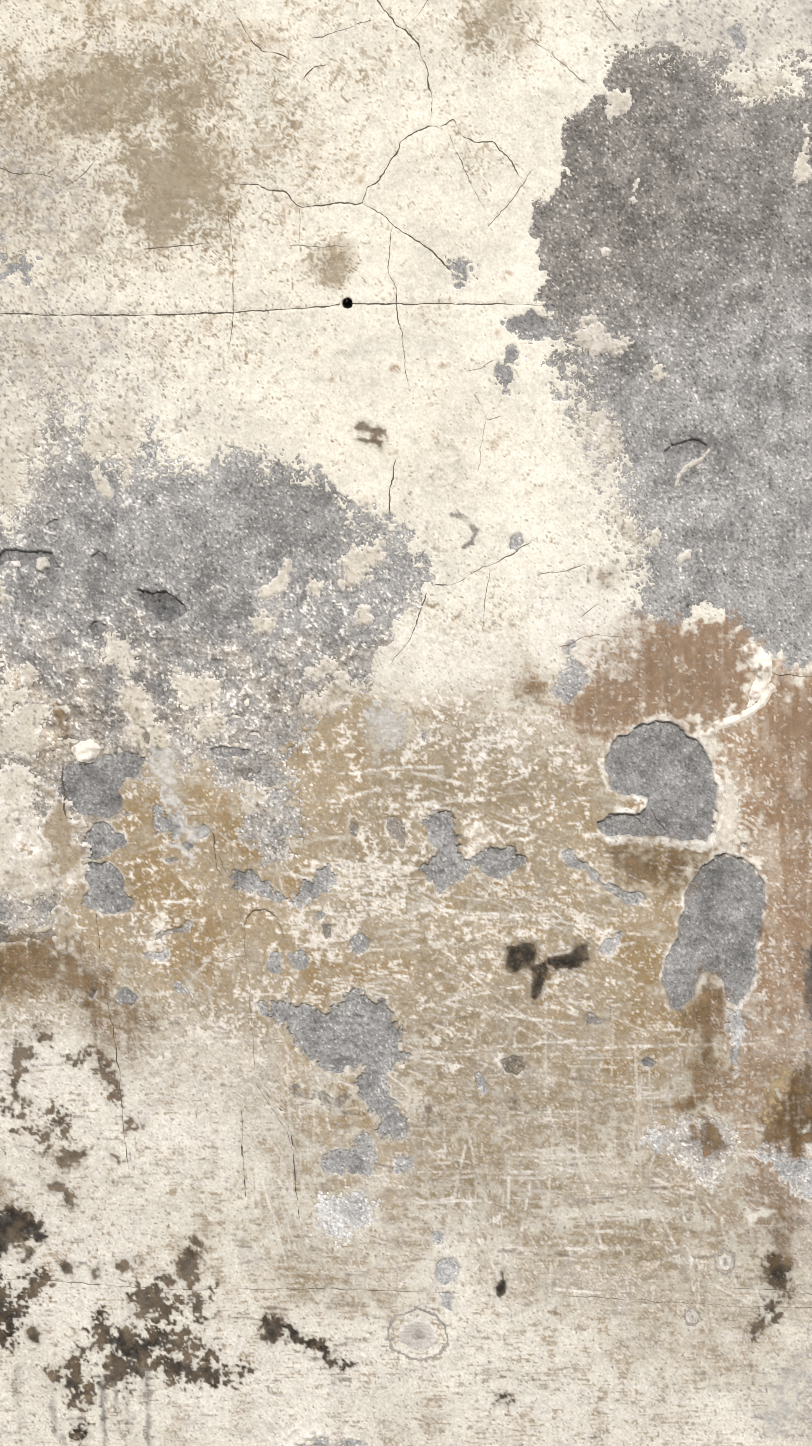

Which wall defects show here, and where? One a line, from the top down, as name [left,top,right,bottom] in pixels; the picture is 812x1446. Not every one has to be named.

crack [1,0,541,385]
flaking render [493,24,812,673]
crack [388,459,396,519]
flaking render [0,367,439,975]
flaking render [597,721,717,842]
damp [711,757,768,886]
damp [505,943,589,1000]
flaking render [662,843,766,1076]
flaking render [256,988,414,1248]
damp [0,1205,73,1353]
damp [43,1235,254,1441]
damp [260,1314,356,1371]